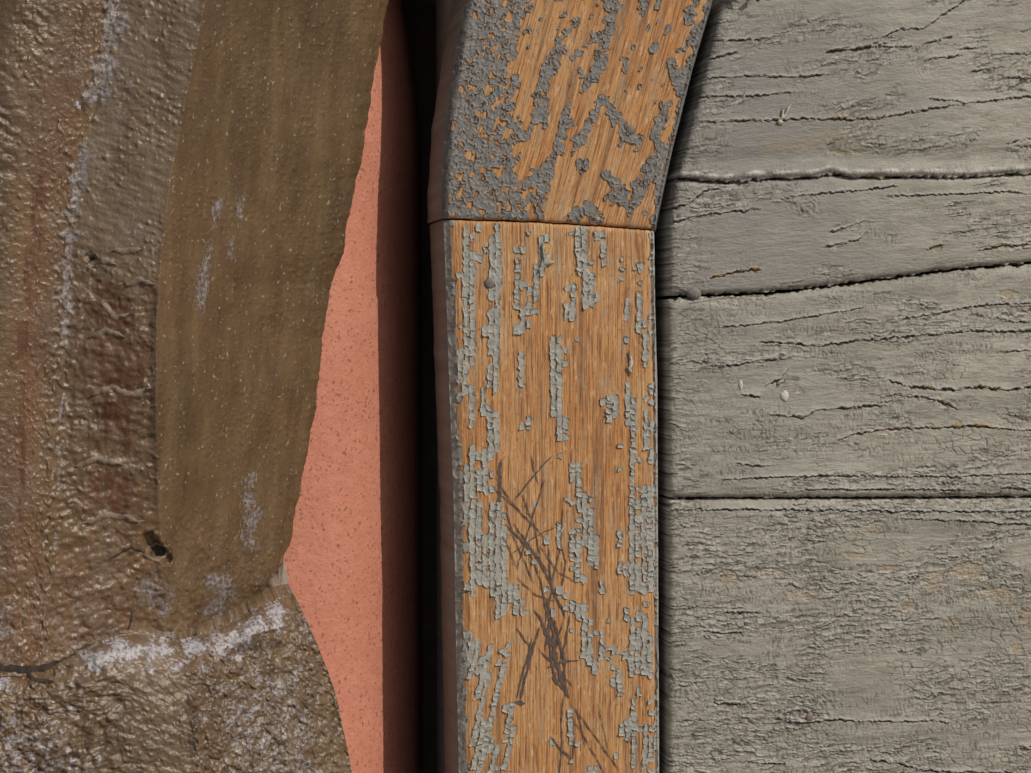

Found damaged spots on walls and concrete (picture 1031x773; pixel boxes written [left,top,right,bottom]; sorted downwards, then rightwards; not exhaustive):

crack [699,1,1031,123]
crack [670,186,758,225]
crack [788,183,1019,198]
crack [979,243,1029,251]
peeling [441,0,713,773]
crack [718,303,1031,440]
water stain [239,472,262,551]
crack [674,464,1031,526]
crack [0,643,94,683]
water stain [0,693,102,773]
water stain [80,574,333,773]
crack [713,700,946,724]